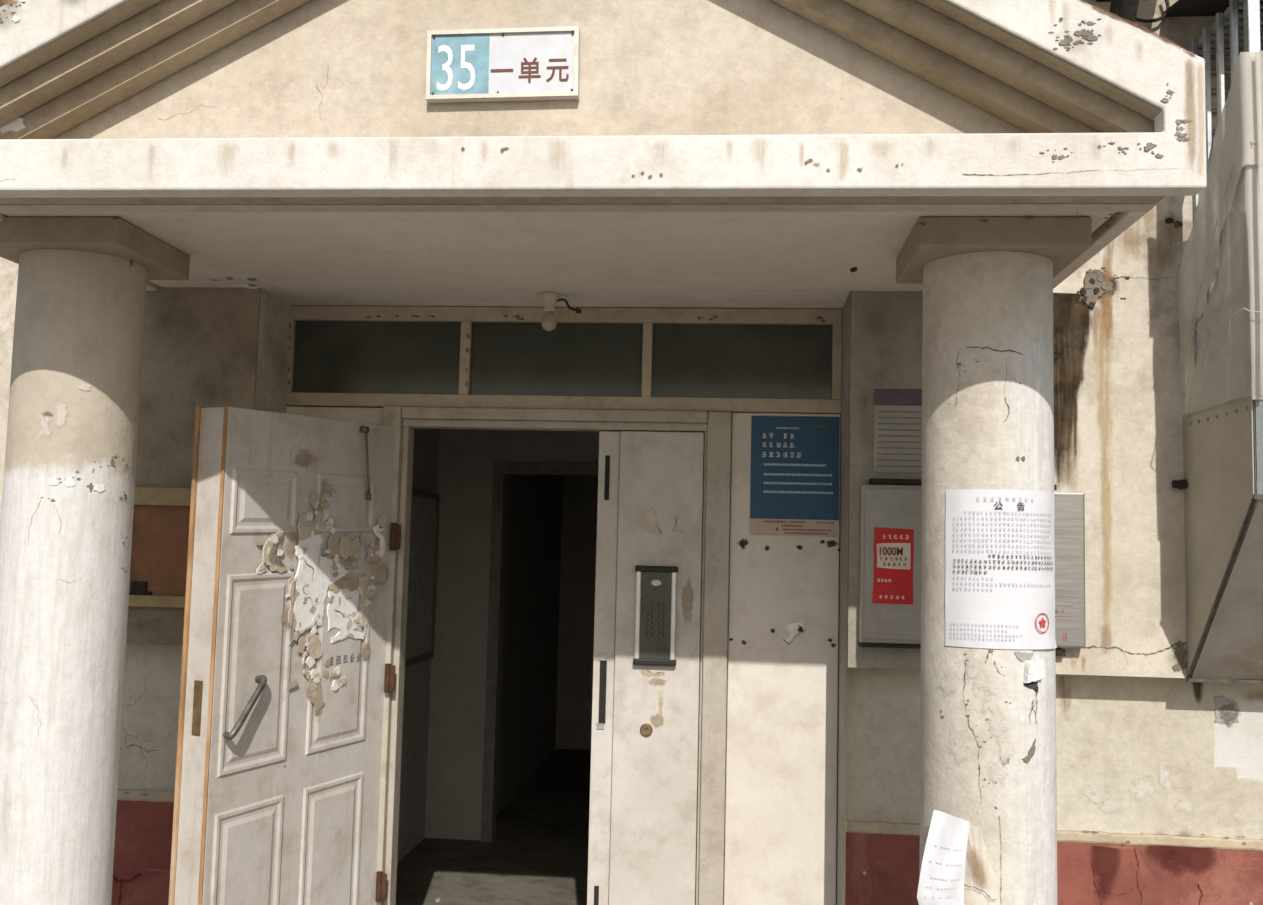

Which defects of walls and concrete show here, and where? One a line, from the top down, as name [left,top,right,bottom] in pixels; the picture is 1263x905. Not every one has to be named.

spalling [1048,17,1101,51]
spalling [1097,142,1164,158]
spalling [1077,267,1129,309]
rust [1094,246,1112,437]
crack [956,346,1022,421]
damp [1053,293,1090,477]
spalling [40,455,128,502]
crack [1086,643,1186,664]
spalling [1214,695,1240,727]
damp [1093,845,1118,897]
crack [1092,849,1142,905]
damp [1149,845,1213,872]